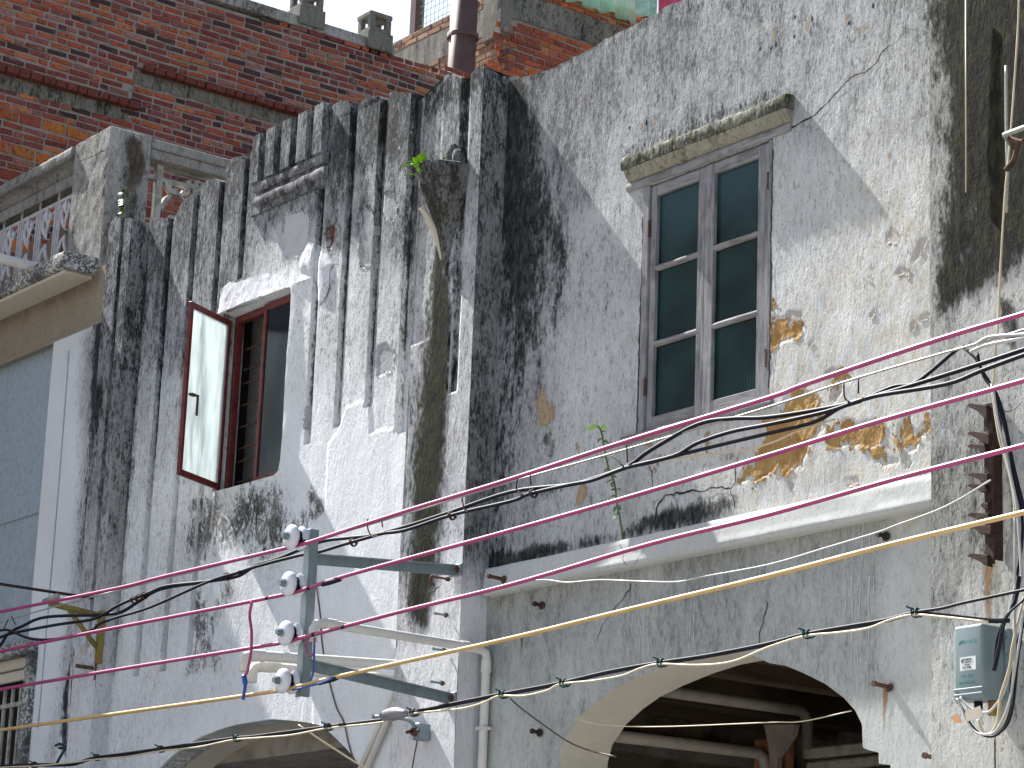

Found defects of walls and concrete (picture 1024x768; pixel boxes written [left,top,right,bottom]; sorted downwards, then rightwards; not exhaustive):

crack [792,28,916,128]
leakage [104,137,145,256]
leakage [929,0,1024,316]
leakage [492,77,568,523]
flaking render [769,298,813,353]
leakage [92,377,104,442]
leakage [405,246,459,630]
flaking render [535,383,555,427]
flaking render [737,366,931,492]
leakage [186,482,325,561]
leakage [488,496,733,568]
crack [597,454,739,641]